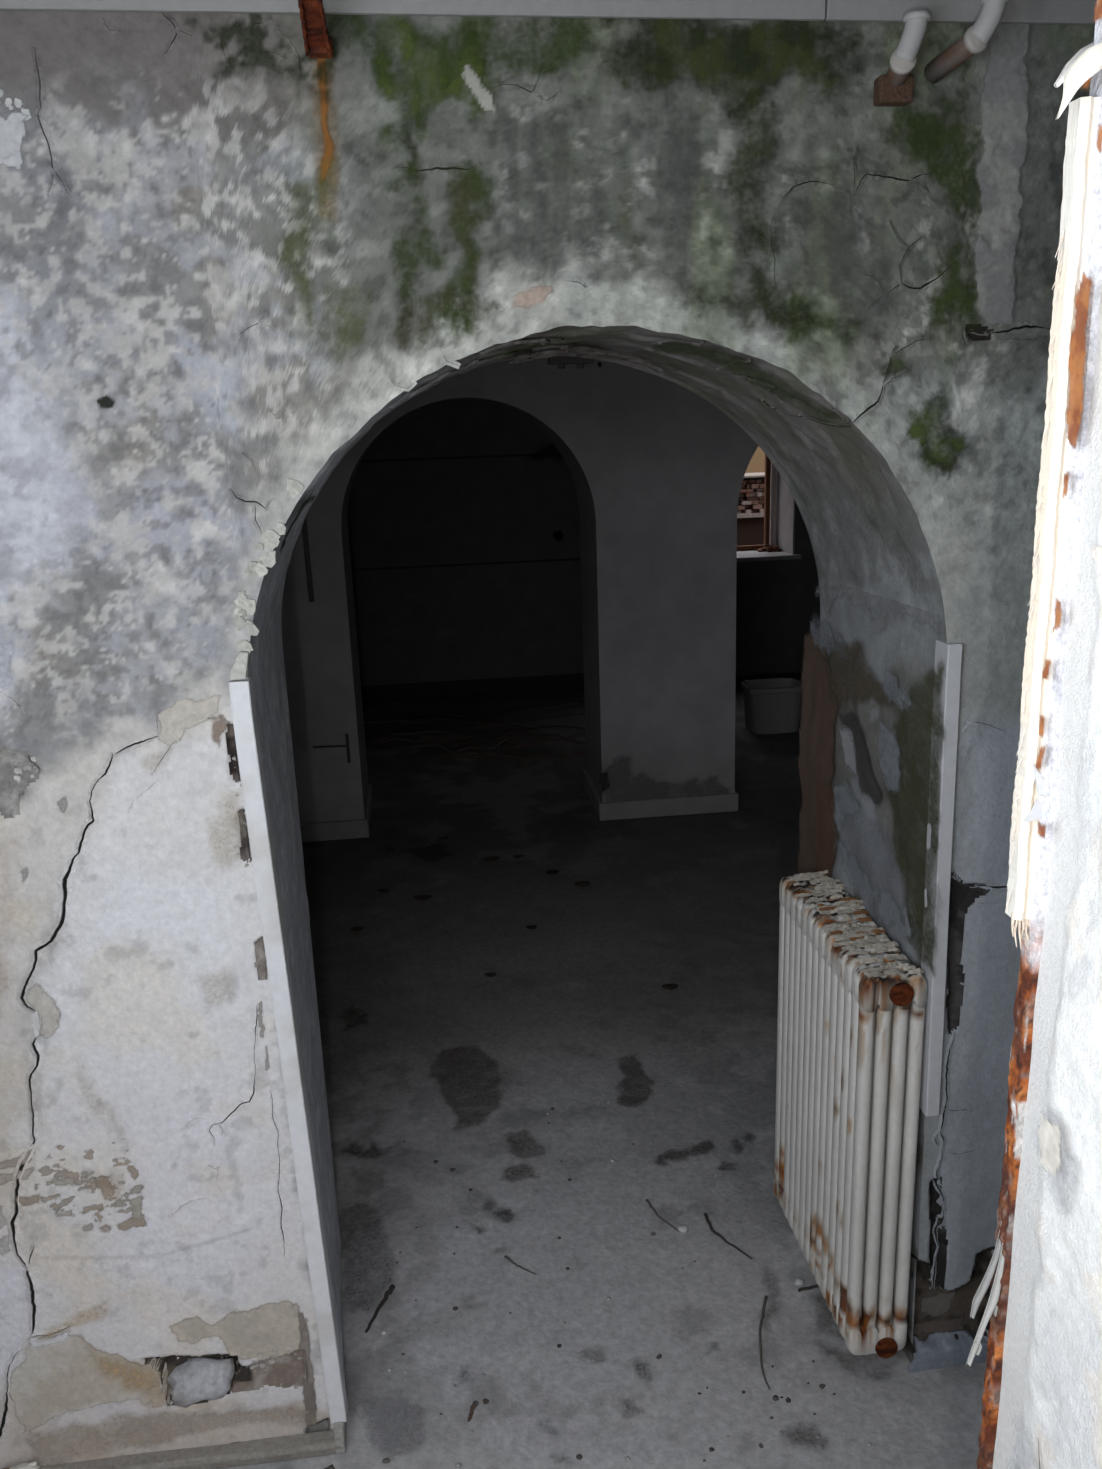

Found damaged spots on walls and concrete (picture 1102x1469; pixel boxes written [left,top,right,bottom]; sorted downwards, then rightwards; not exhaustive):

damp [328,15,366,45]
damp [483,18,584,72]
peeling [0,89,32,169]
corrosion [316,58,334,195]
damp [727,103,776,197]
damp [393,136,490,345]
damp [746,271,859,343]
peeling [798,622,911,940]
spalling [946,872,991,1035]
crack [0,710,212,1446]
peeling [0,1145,146,1254]
peeling [9,1301,330,1433]